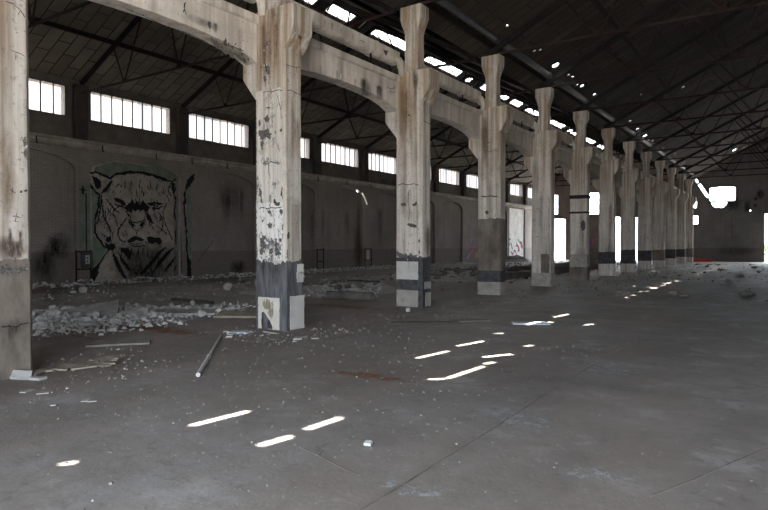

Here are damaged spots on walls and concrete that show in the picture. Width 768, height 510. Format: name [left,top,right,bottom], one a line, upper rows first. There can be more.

peeling [256,105,282,159]
peeling [256,184,290,259]